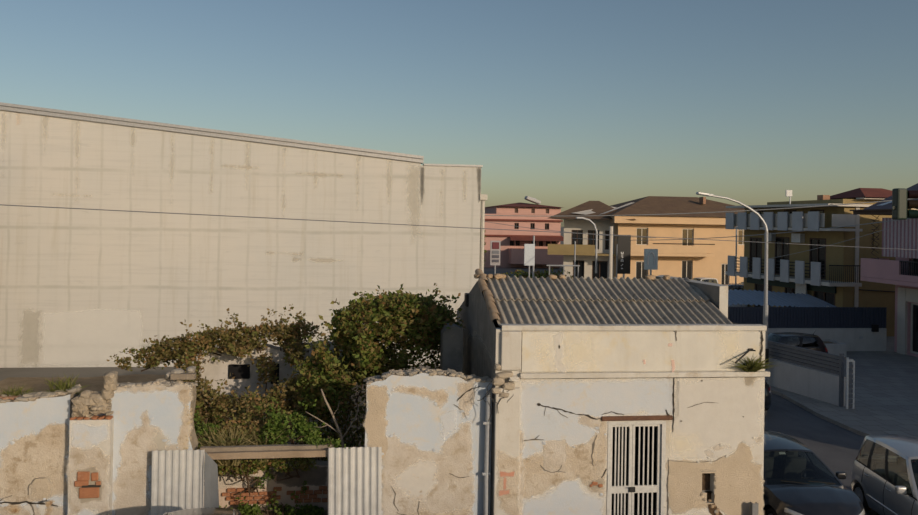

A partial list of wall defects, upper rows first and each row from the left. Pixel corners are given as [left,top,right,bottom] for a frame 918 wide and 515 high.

crack [0,495,58,515]
peeling [0,384,192,515]
peeling [364,381,475,515]
peeling [493,414,607,515]
crack [540,405,578,418]
crack [591,411,624,466]
peeling [663,440,764,515]